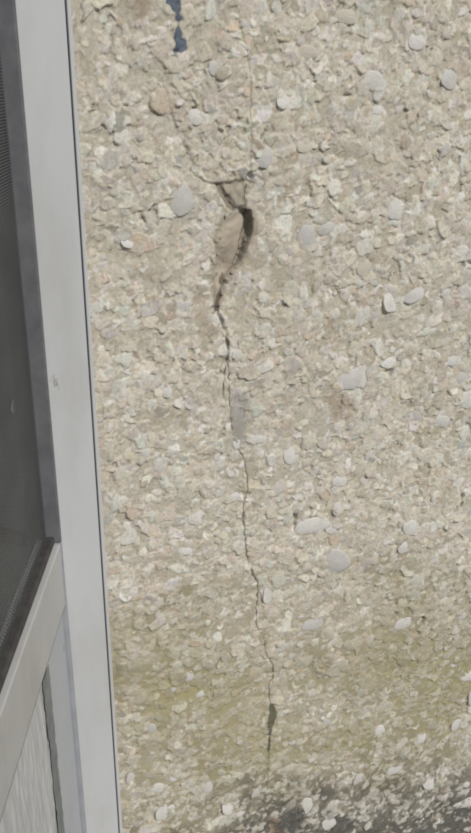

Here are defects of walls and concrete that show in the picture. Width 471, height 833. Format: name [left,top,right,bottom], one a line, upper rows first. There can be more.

spalling [212,182,257,302]
crack [214,272,233,429]
crack [238,449,274,698]